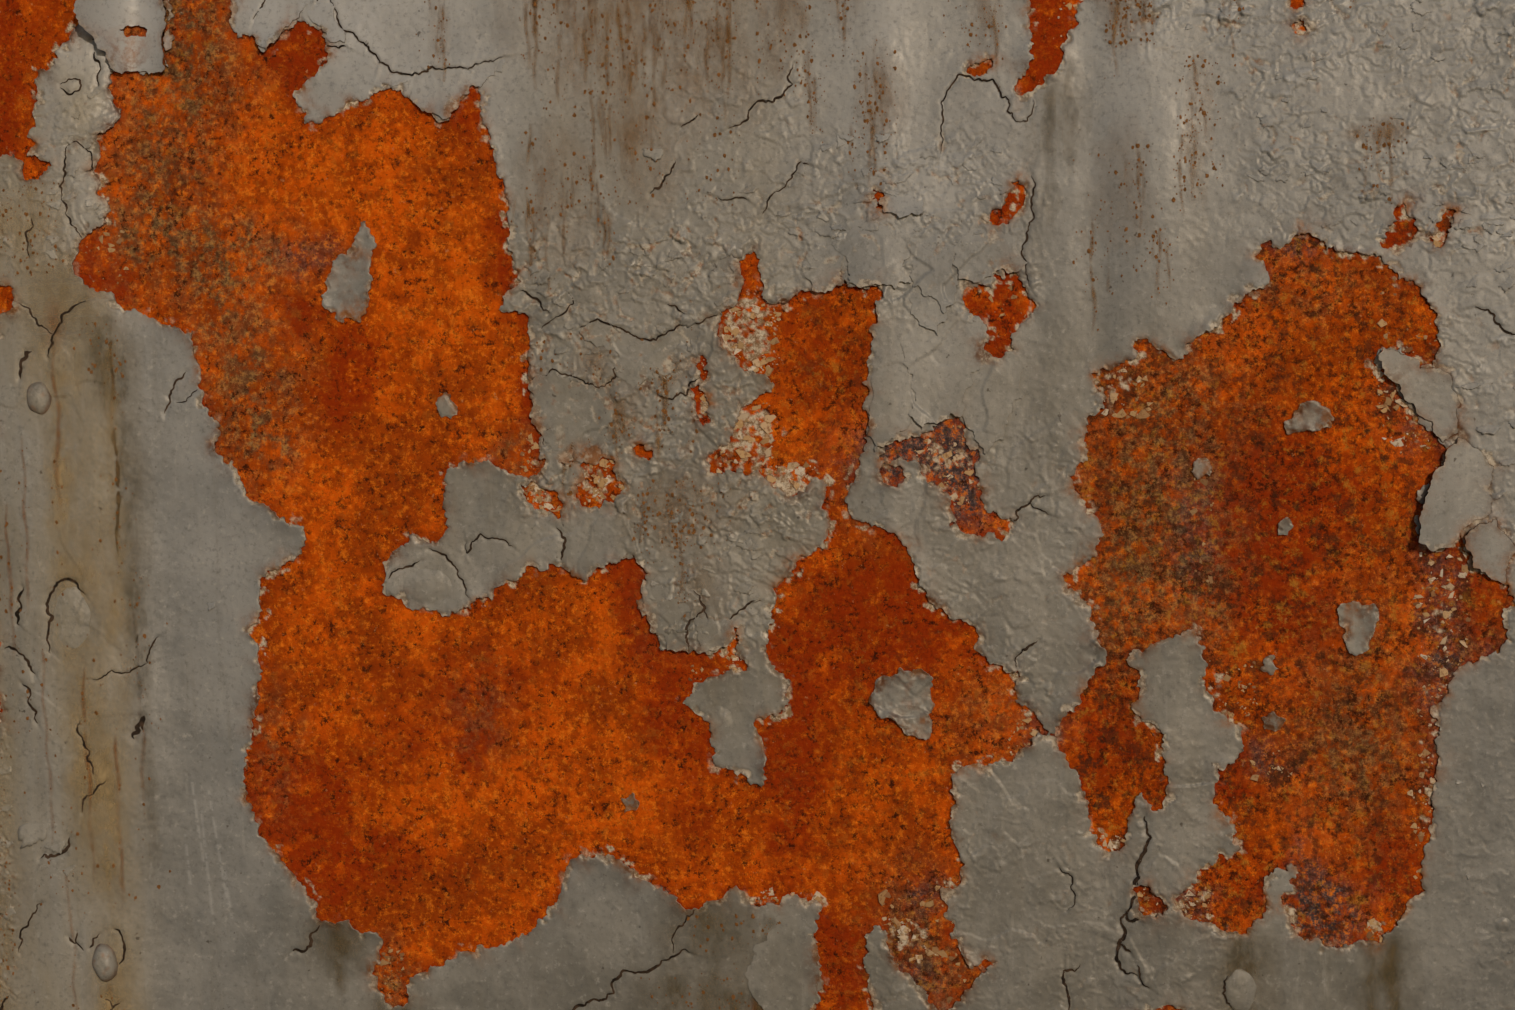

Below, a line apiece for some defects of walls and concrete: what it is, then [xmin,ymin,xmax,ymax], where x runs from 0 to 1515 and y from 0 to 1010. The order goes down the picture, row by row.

peeling [1014,0,1084,96]
rust [511,0,898,265]
peeling [1378,202,1419,250]
rust [532,333,635,496]
rust [638,327,698,453]
crack [5,578,86,723]
peeling [72,0,1049,1010]
rust [632,479,731,618]
peeling [1050,233,1515,948]
crack [41,723,106,859]
crack [131,716,146,739]
crack [572,910,695,1010]